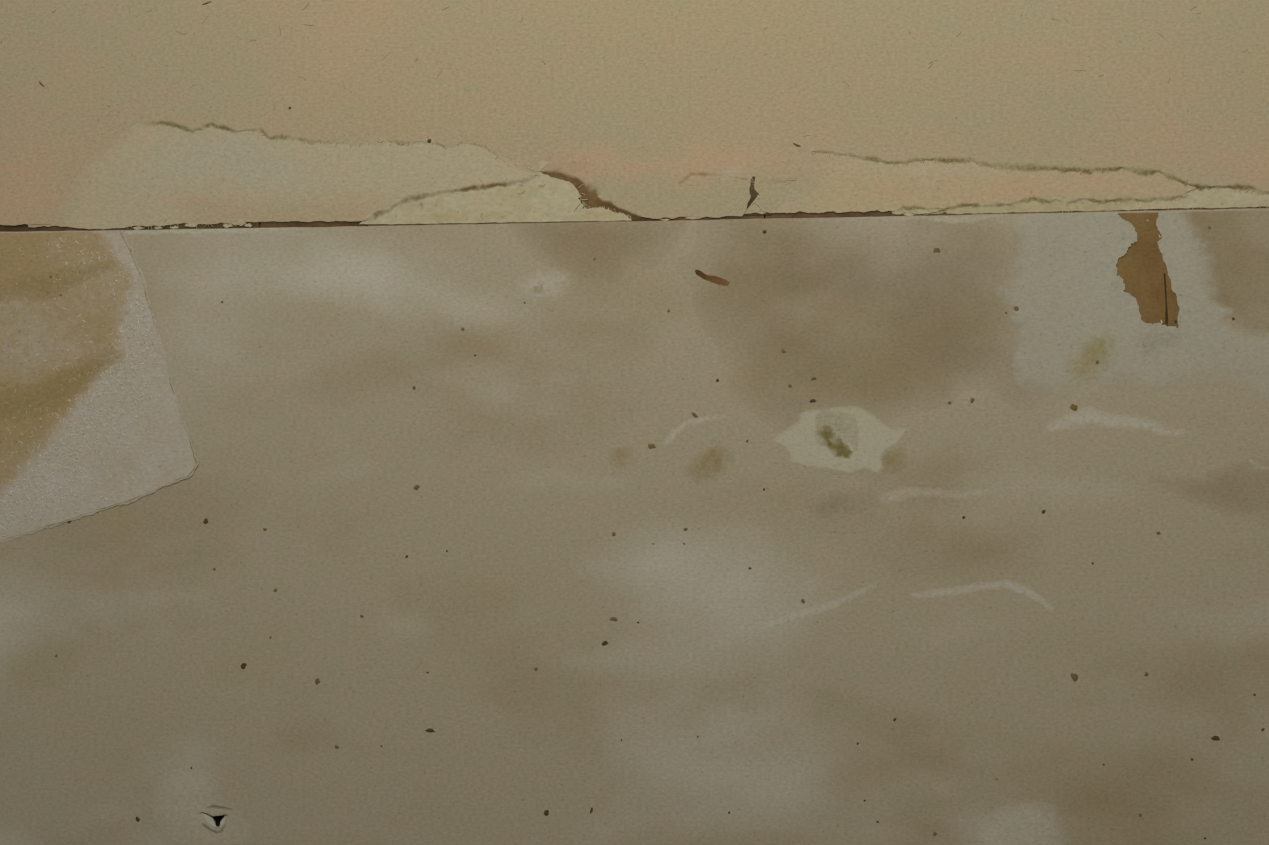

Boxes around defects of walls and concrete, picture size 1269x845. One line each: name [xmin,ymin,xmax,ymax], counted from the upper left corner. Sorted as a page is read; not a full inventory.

peeling [28,119,549,230]
peeling [744,147,1195,328]
water stain [507,218,1042,433]
spalling [771,403,909,475]
water stain [1149,457,1269,515]